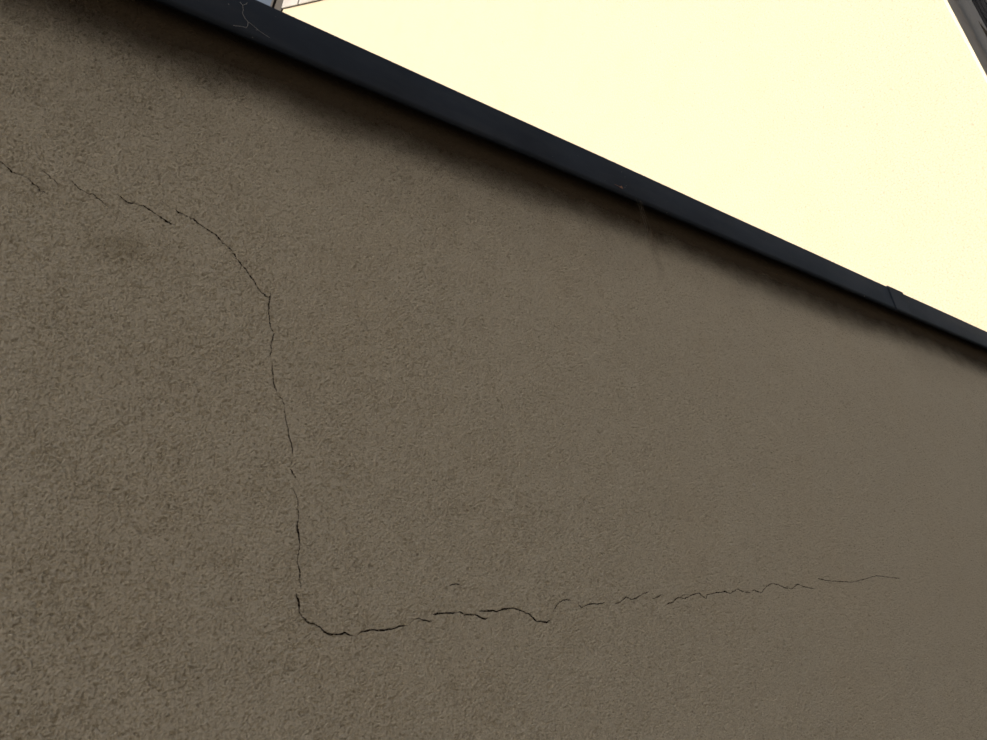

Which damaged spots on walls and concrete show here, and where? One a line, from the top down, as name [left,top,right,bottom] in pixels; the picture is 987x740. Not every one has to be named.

crack [0,161,900,637]